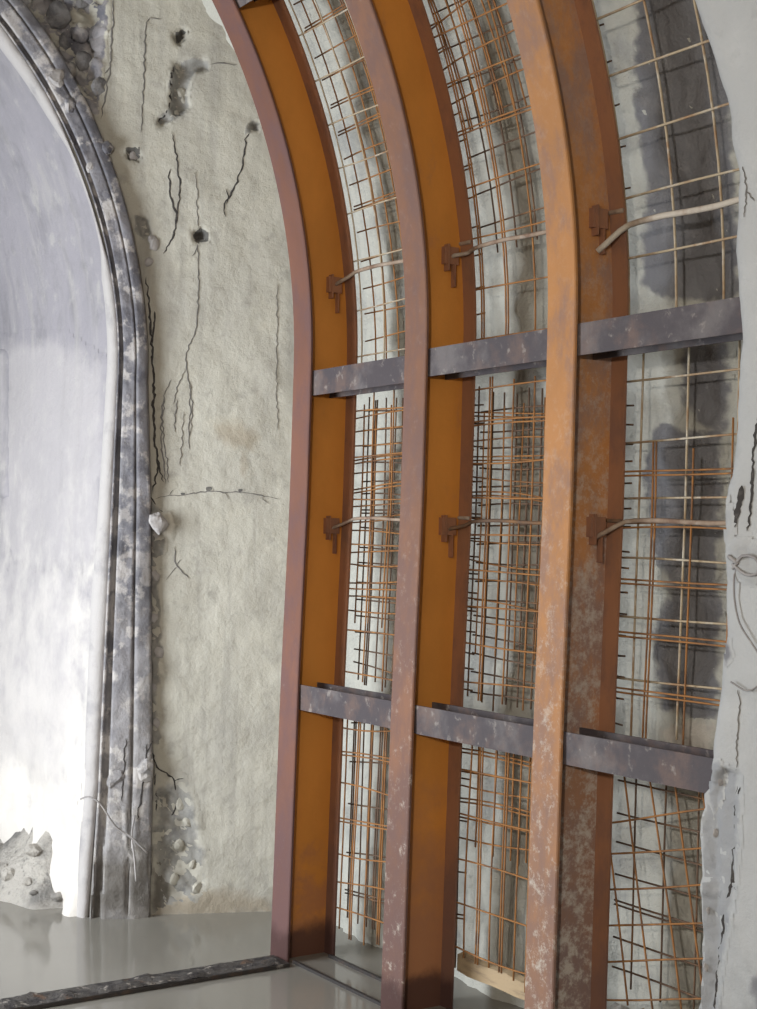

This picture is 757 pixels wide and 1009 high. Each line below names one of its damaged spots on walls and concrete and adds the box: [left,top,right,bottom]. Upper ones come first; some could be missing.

spalling [22,0,111,118]
crack [101,2,114,117]
crack [141,17,158,130]
spalling [152,29,213,128]
crack [145,133,277,512]
crack [746,423,757,530]
spalling [151,499,178,748]
crack [121,738,183,819]
spalling [151,772,212,905]
crack [713,690,741,1008]